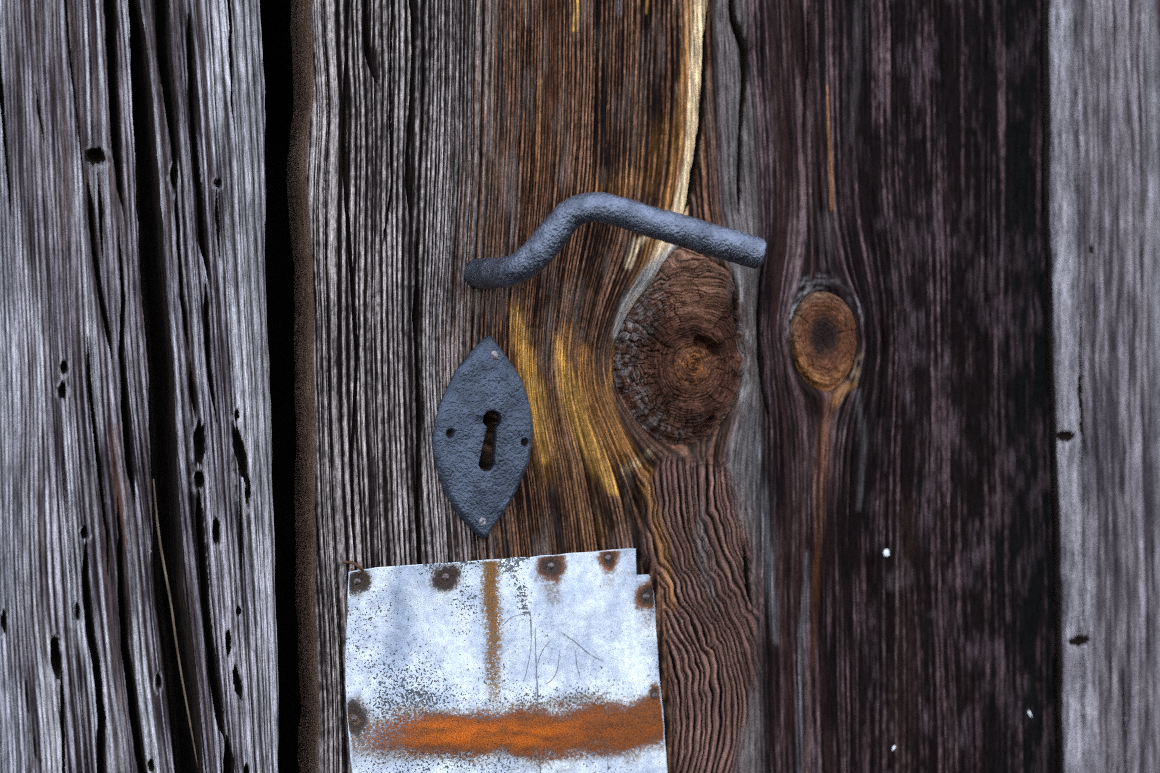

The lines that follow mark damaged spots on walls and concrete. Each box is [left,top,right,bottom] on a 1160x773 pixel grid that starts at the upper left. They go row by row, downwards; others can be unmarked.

rust [347,555,664,771]
rust [596,551,621,575]